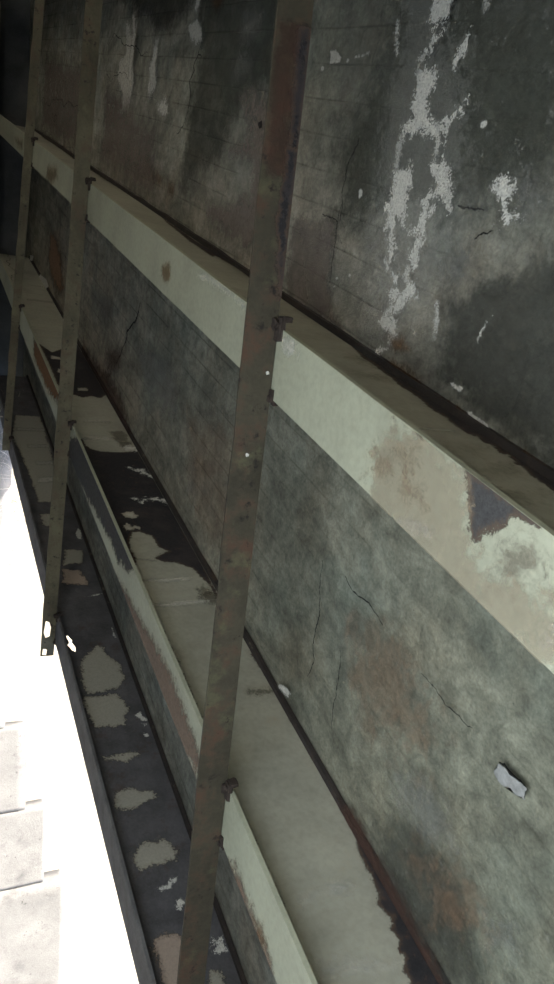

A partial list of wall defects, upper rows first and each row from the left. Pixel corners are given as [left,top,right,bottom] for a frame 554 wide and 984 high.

water stain [117,0,203,117]
water stain [451,25,476,72]
water stain [374,0,470,355]
water stain [490,172,526,225]
peeling [69,437,166,574]
crack [307,560,323,677]
crack [422,674,472,728]
spalling [494,764,527,800]